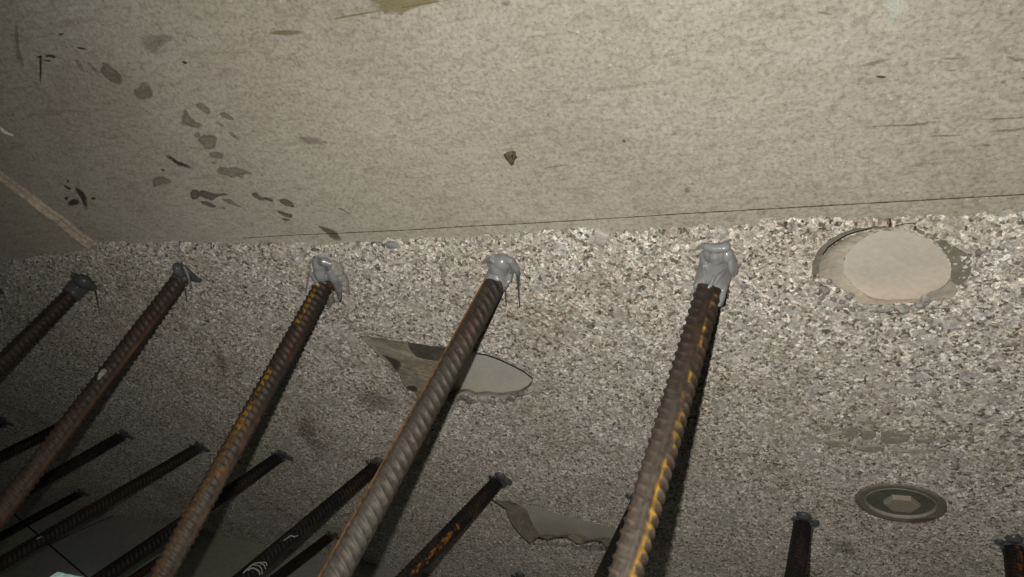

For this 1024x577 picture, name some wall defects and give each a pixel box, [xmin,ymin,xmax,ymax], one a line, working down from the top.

spalling [0,256,350,577]
spalling [232,253,520,577]
spalling [594,242,738,577]
spalling [784,511,820,577]
peeling [822,420,974,453]
spalling [994,534,1024,577]